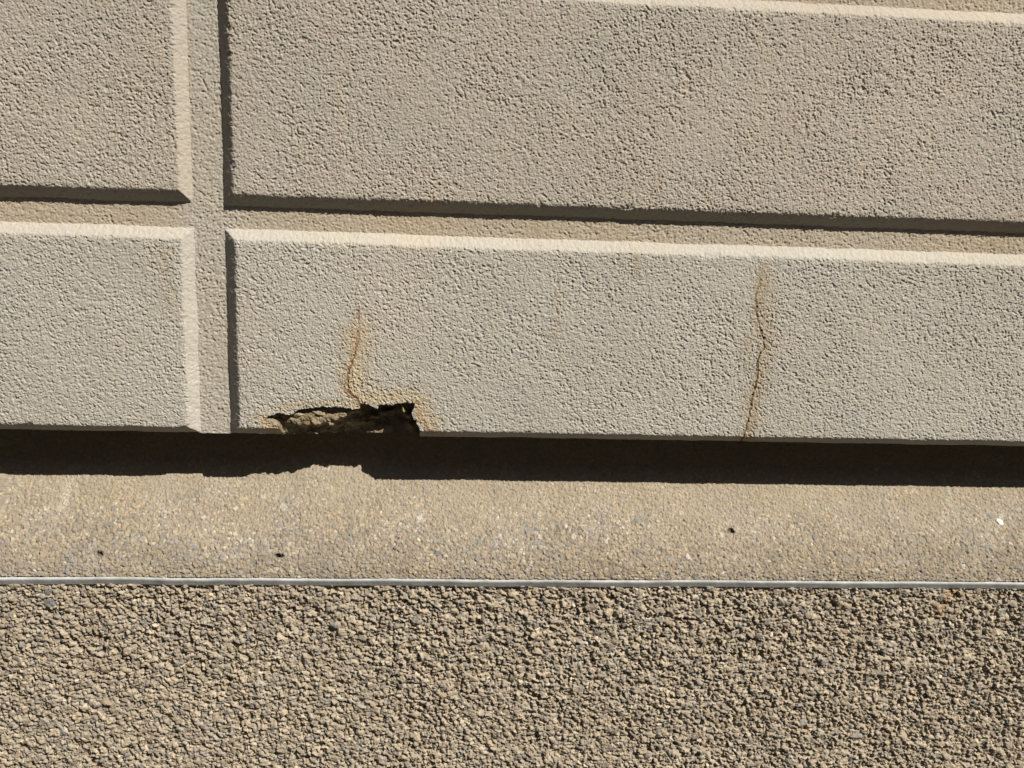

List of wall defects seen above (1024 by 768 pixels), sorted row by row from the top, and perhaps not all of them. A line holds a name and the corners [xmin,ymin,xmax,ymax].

crack [347,345,360,406]
crack [741,286,773,441]
spalling [265,402,421,434]